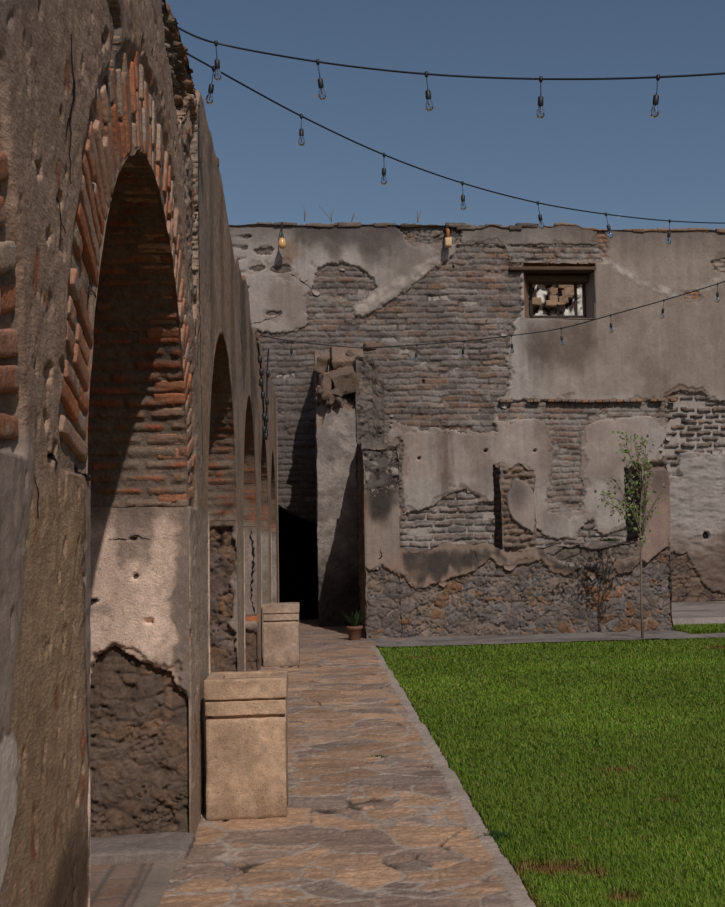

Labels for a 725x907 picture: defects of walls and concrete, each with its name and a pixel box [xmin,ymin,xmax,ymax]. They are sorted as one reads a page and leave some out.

crack [56,34,76,240]
flaking render [161,2,197,307]
crack [81,253,98,354]
flaking render [257,226,725,549]
flaking render [365,520,725,639]
flaking render [90,645,189,837]